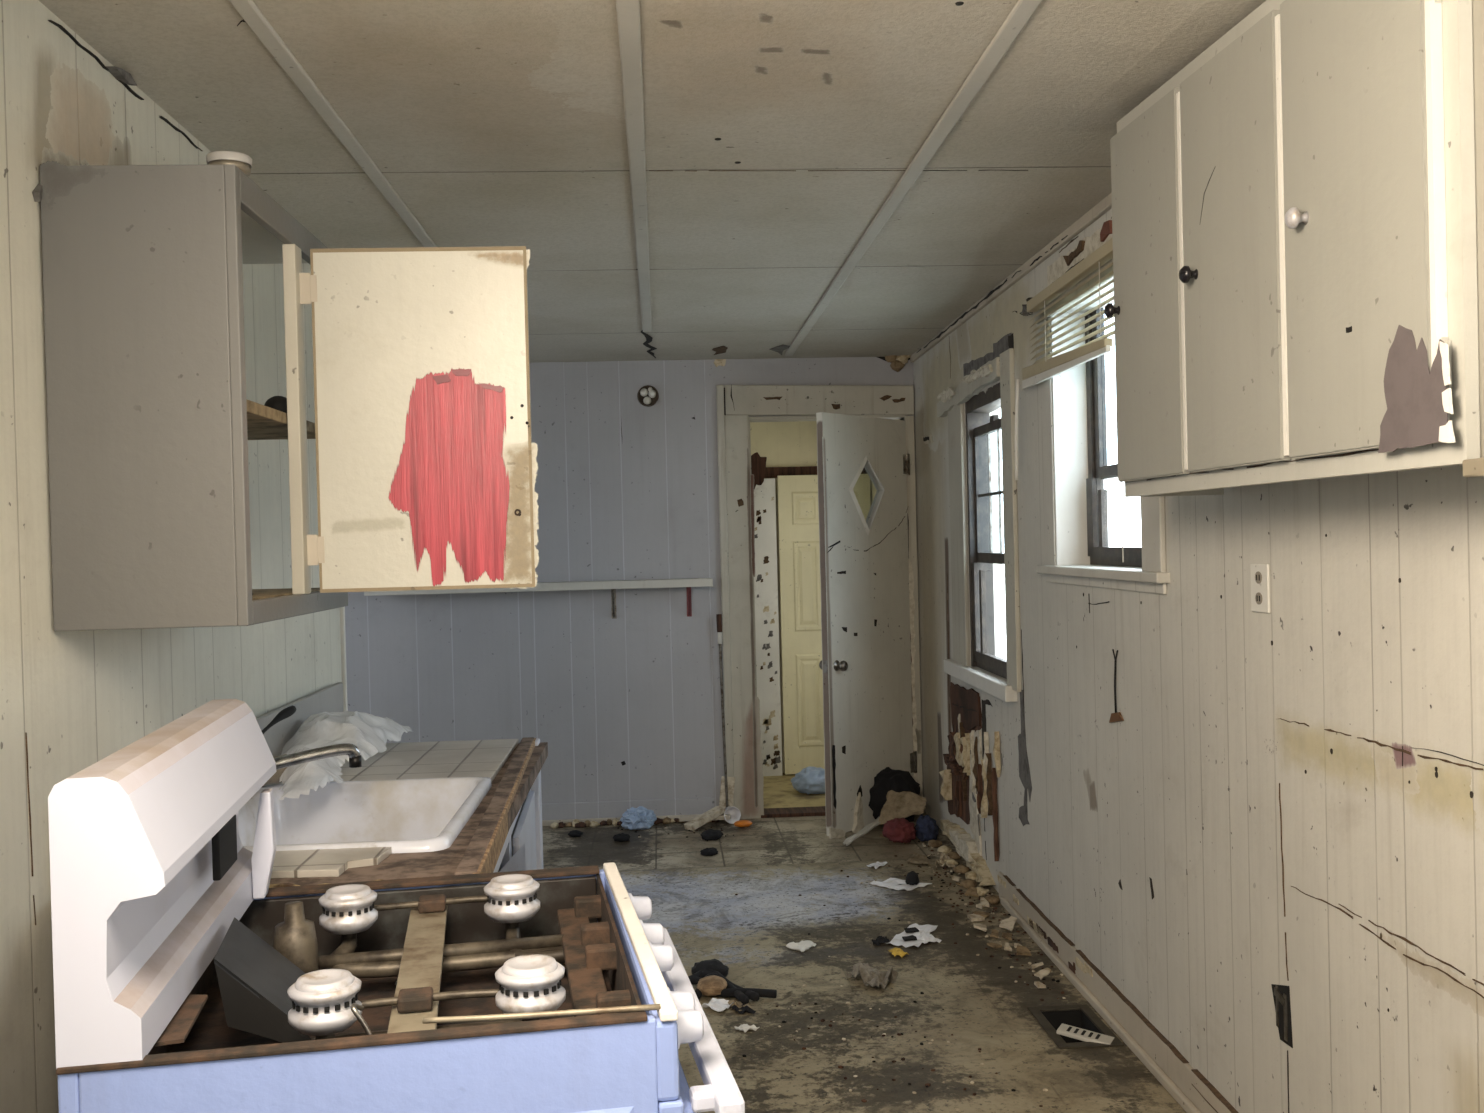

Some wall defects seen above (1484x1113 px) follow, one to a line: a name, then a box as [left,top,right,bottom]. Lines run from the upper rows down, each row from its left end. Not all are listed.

peeling [939,732,967,801]
damp [1264,704,1484,843]
crack [1281,719,1484,770]
flaking render [928,820,1093,988]
crack [1279,783,1484,1017]
crack [1284,1050,1292,1113]